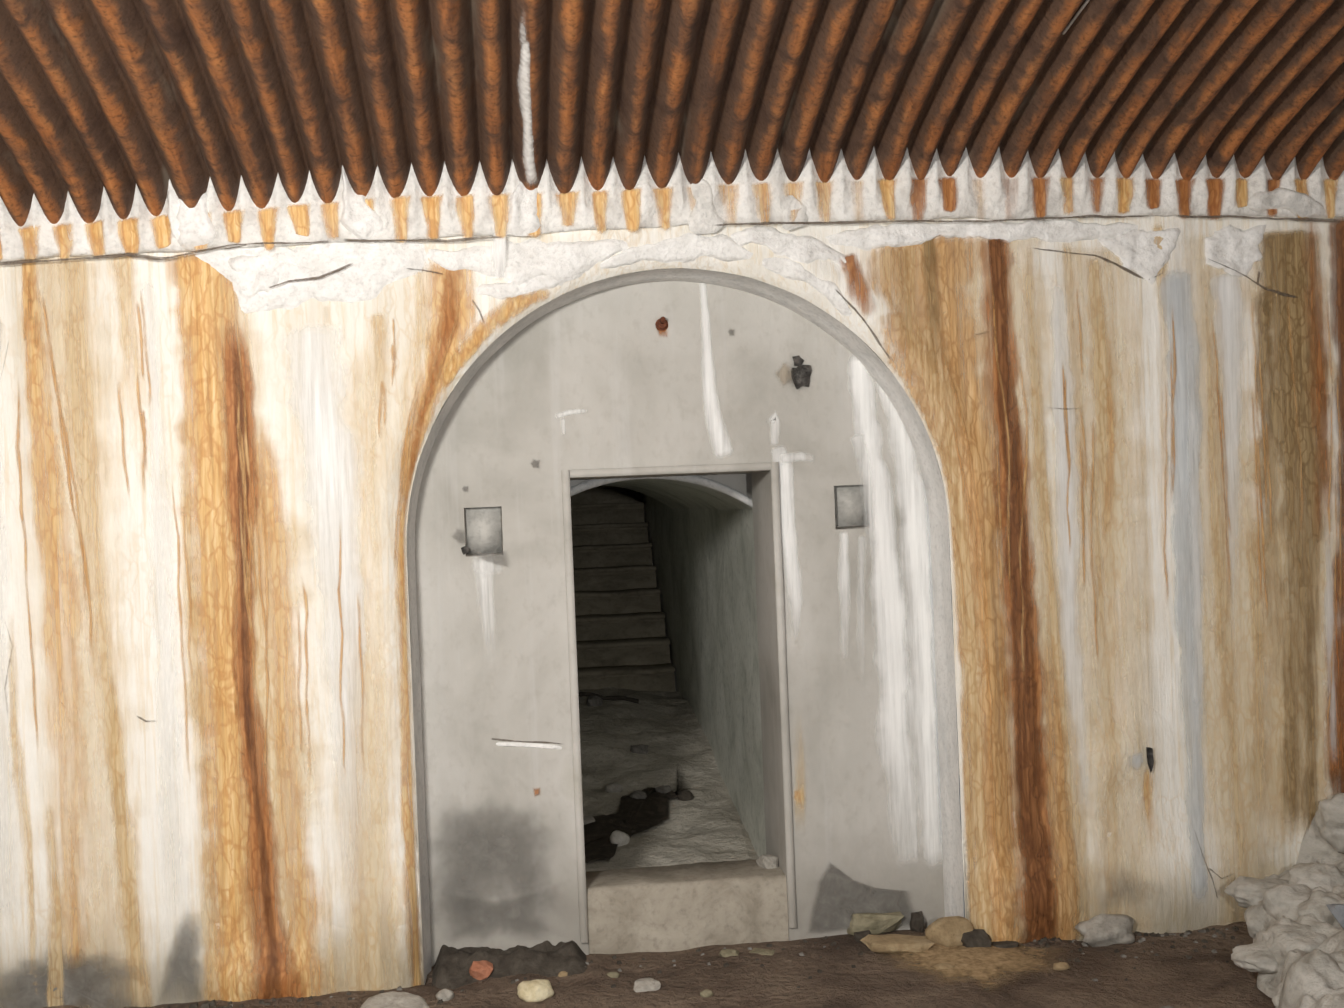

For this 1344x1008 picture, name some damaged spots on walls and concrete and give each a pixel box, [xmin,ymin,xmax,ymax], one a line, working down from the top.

crack [719,215,1164,280]
corrosion [1176,178,1247,219]
crack [1209,259,1296,298]
crack [1178,214,1336,222]
leakage [167,31,1207,893]
corrosion [1208,179,1344,844]
corrosion [118,215,333,1002]
corrosion [396,266,545,986]
corrosion [843,237,1079,943]
leakage [446,821,534,931]
leakage [0,961,128,1008]
leakage [165,928,196,989]